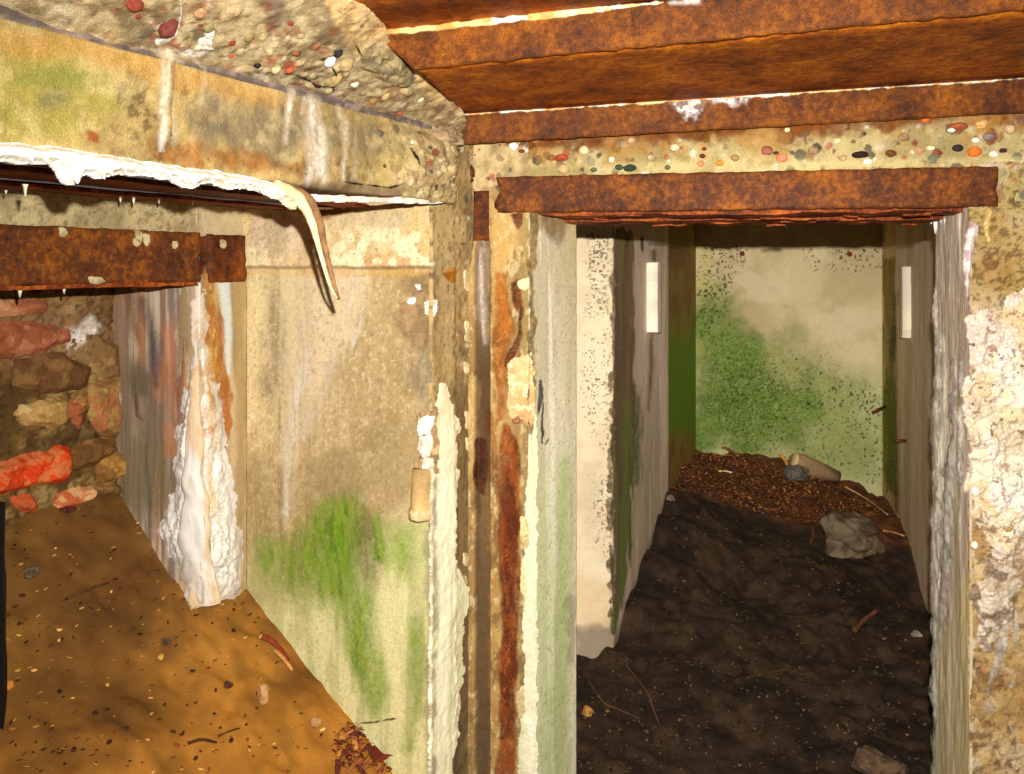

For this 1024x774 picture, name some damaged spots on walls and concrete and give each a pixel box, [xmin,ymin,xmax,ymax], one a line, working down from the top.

leakage [175,329,184,424]
corrosion [204,271,233,435]
leakage [0,1,443,310]
mould [699,248,741,324]
mould [717,345,880,482]
corrosion [760,215,858,228]
flaking render [427,383,471,774]
corrosion [493,274,523,774]